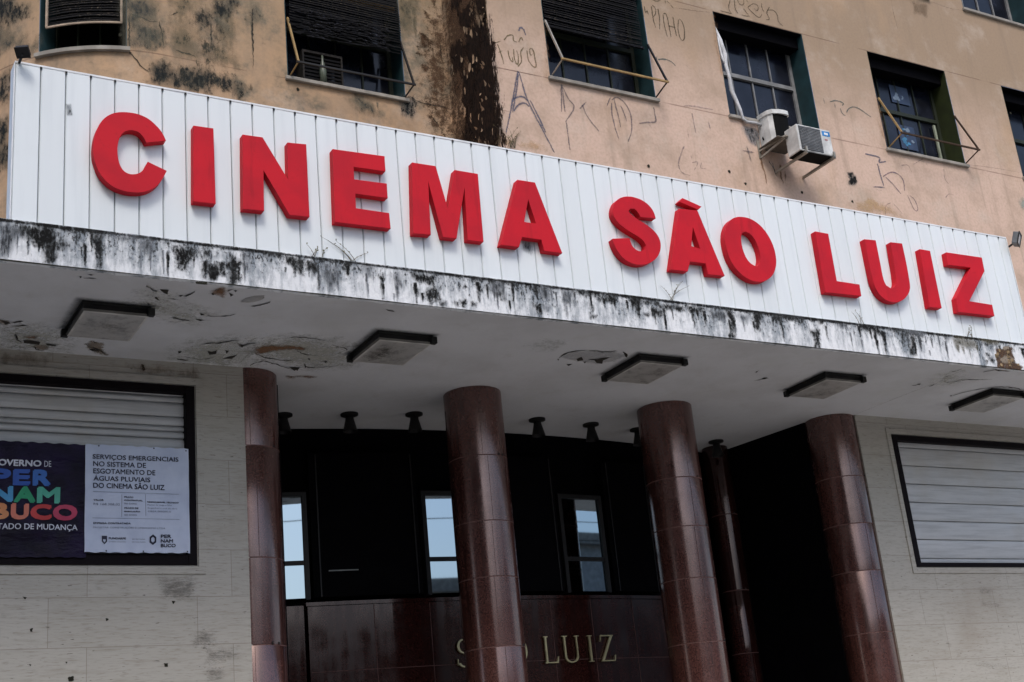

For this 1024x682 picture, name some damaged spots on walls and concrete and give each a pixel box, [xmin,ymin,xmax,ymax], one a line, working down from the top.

water stain [123,0,162,48]
water stain [148,0,244,99]
water stain [0,218,1024,371]
peeling [0,320,61,351]
peeling [85,341,109,355]
peeling [558,350,628,366]